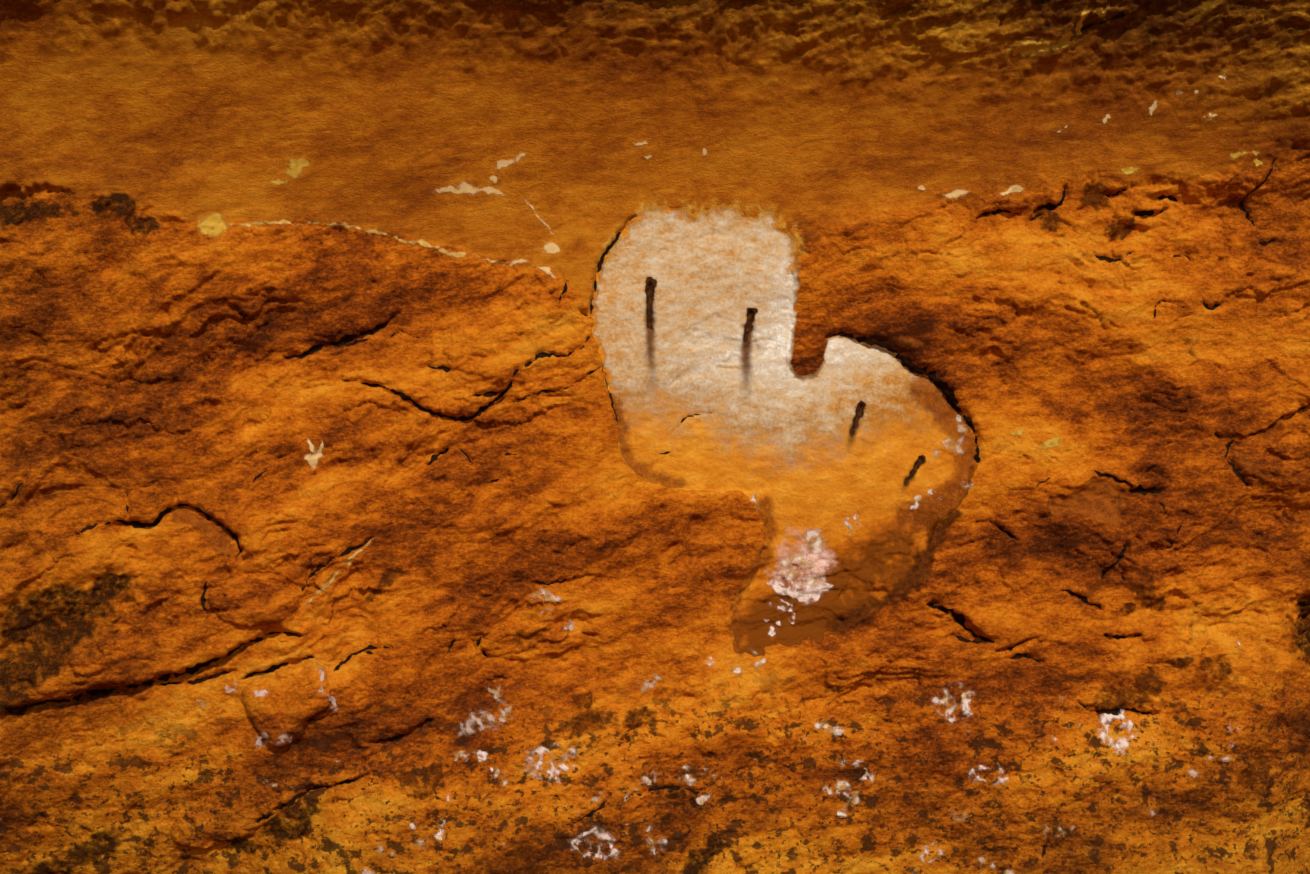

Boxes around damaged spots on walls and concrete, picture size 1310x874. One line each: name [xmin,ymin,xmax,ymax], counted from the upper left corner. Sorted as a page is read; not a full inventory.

crack [285,222,629,486]
rust [646,302,654,360]
rust [742,324,752,374]
spalling [590,199,977,657]
crack [71,494,242,560]
crack [199,582,207,610]
leakage [764,530,835,636]
crack [8,632,389,710]